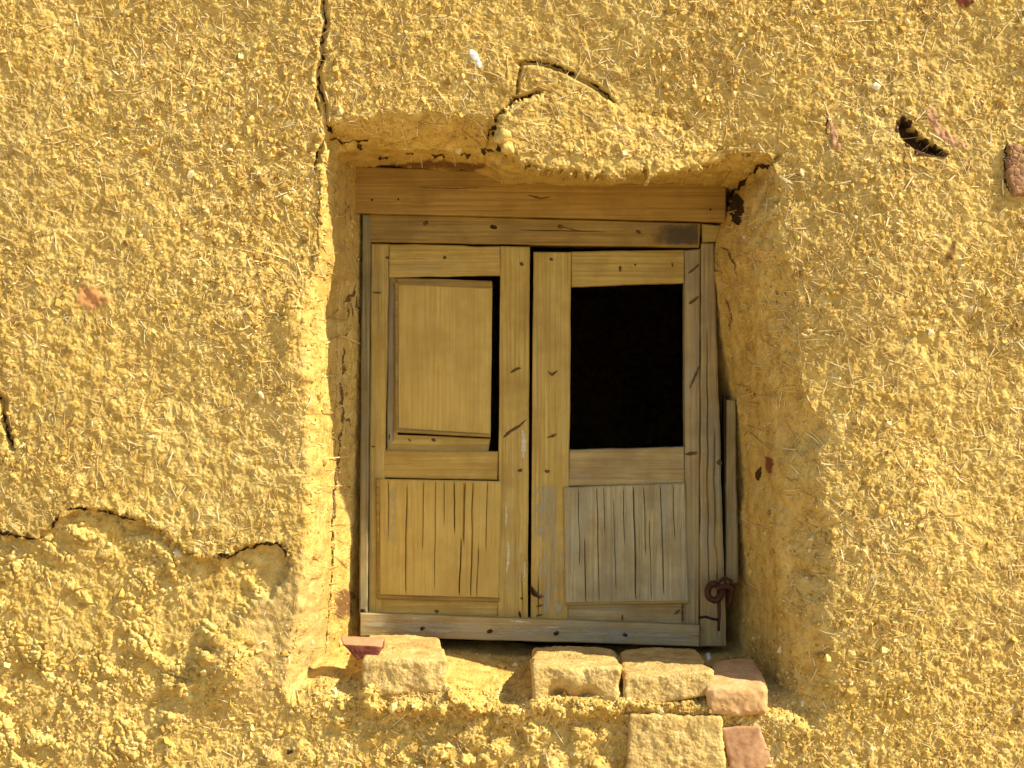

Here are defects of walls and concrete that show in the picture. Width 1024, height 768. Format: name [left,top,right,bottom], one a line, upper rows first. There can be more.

crack [314,1,369,164]
crack [487,60,611,152]
crack [0,397,13,448]
crack [331,286,360,565]
crack [0,506,137,540]
crack [188,541,287,559]